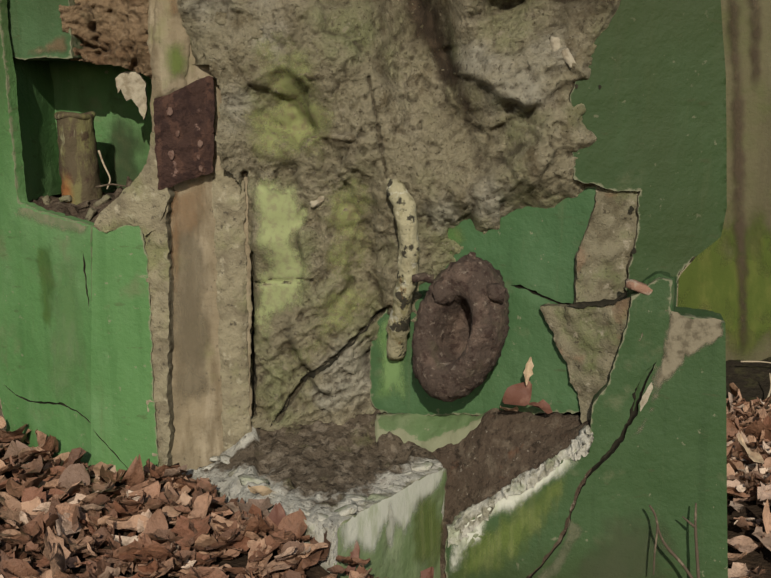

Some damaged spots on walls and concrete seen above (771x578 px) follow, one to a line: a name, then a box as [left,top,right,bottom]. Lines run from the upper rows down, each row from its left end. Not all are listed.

spalling [59,0,152,79]
crack [82,255,90,305]
spalling [177,0,653,431]
water stain [731,0,747,341]
crack [7,387,128,469]
crack [529,362,662,578]